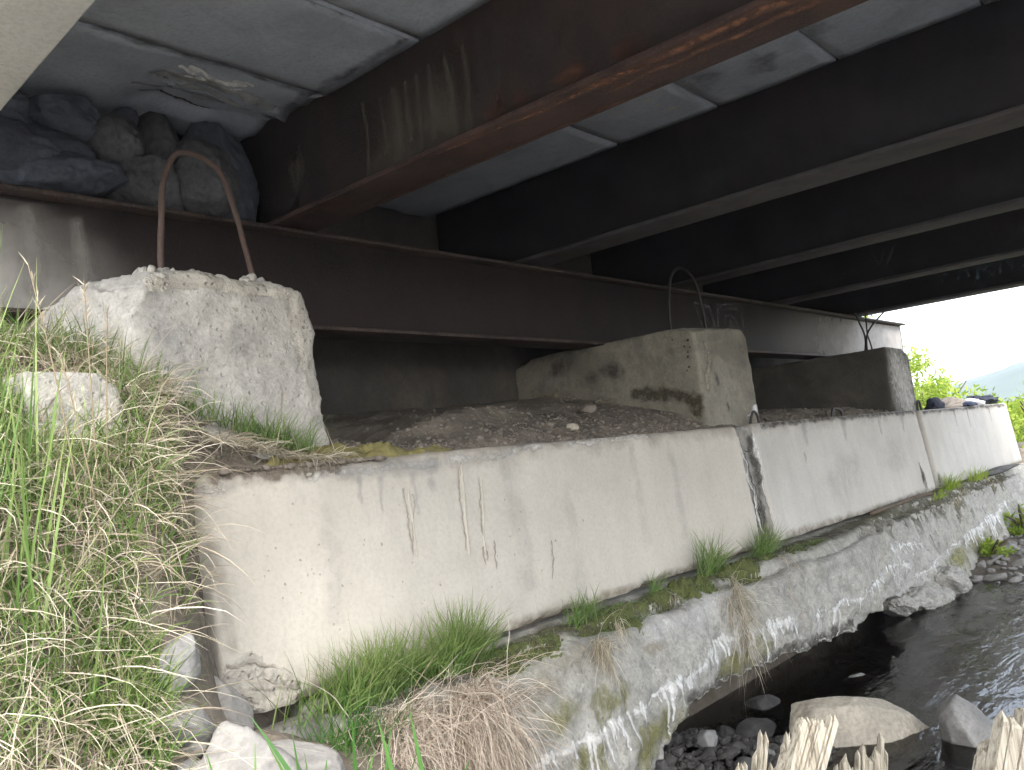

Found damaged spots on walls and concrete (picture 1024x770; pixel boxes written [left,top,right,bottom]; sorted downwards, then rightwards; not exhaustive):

corrosion [556,0,820,104]
crack [403,486,418,557]
crack [458,465,497,568]
water stain [738,404,1004,538]
water stain [530,500,1009,770]